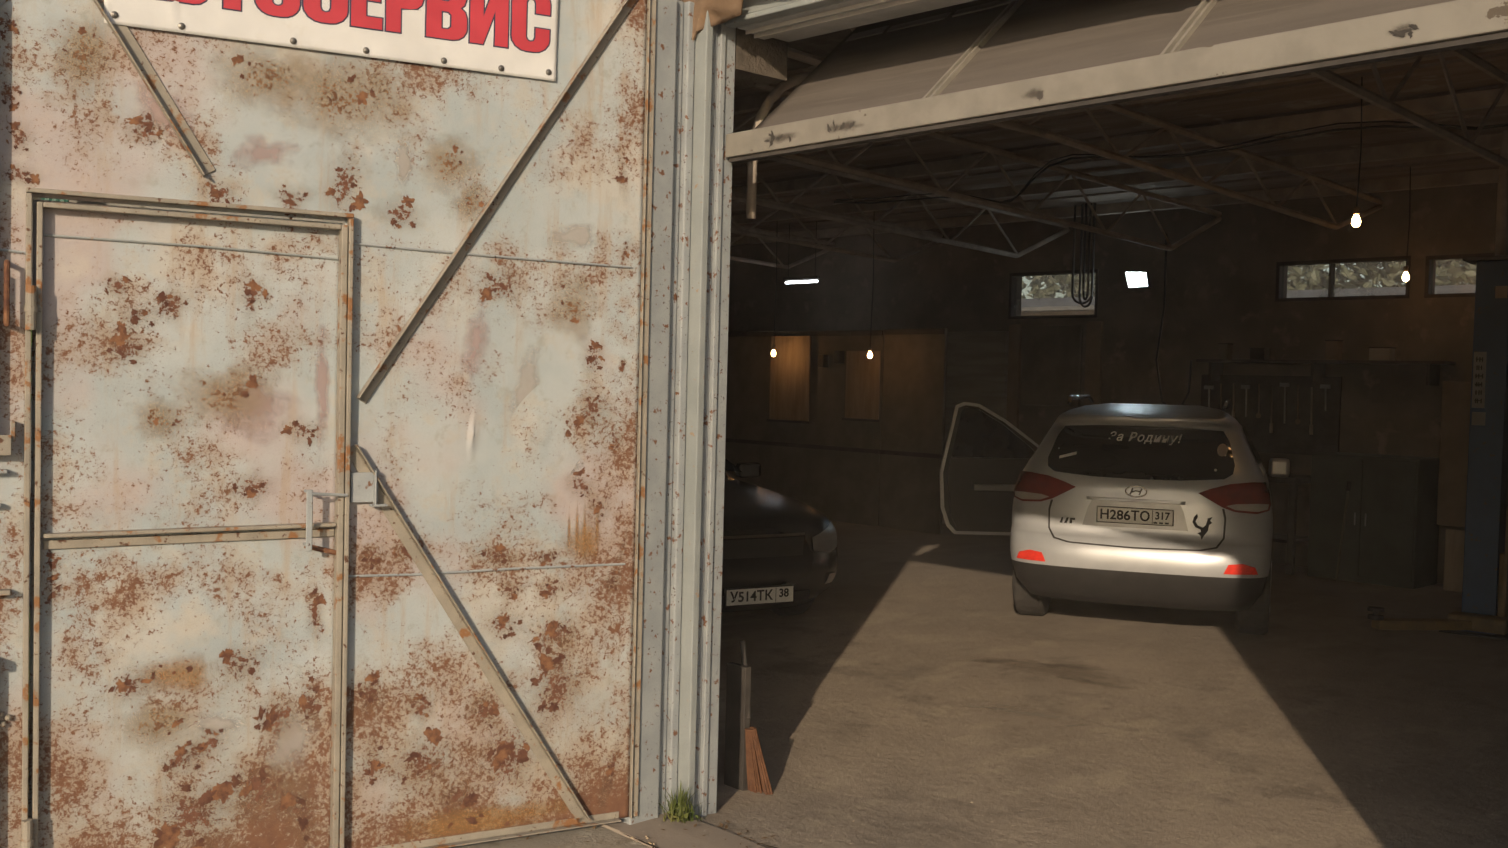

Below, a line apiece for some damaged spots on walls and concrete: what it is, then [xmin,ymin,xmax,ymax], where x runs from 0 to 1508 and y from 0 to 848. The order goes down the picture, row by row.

corrosion [151,664,200,685]
corrosion [431,809,540,835]